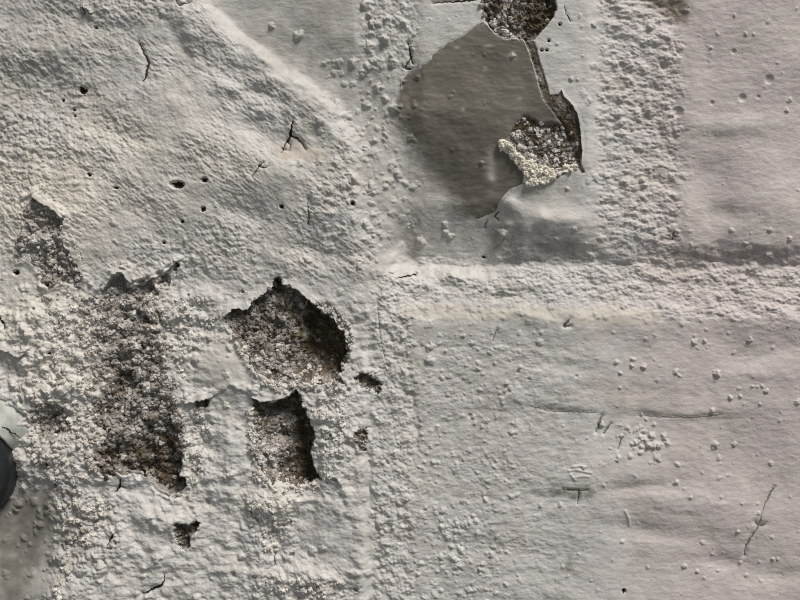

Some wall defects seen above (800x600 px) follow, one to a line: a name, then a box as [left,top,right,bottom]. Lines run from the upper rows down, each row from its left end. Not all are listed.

crack [138,43,151,81]
crack [281,119,306,153]
peeling [397,0,585,219]
spalling [12,192,213,499]
spalling [223,277,355,494]
spalling [174,519,200,551]
crack [744,487,775,555]